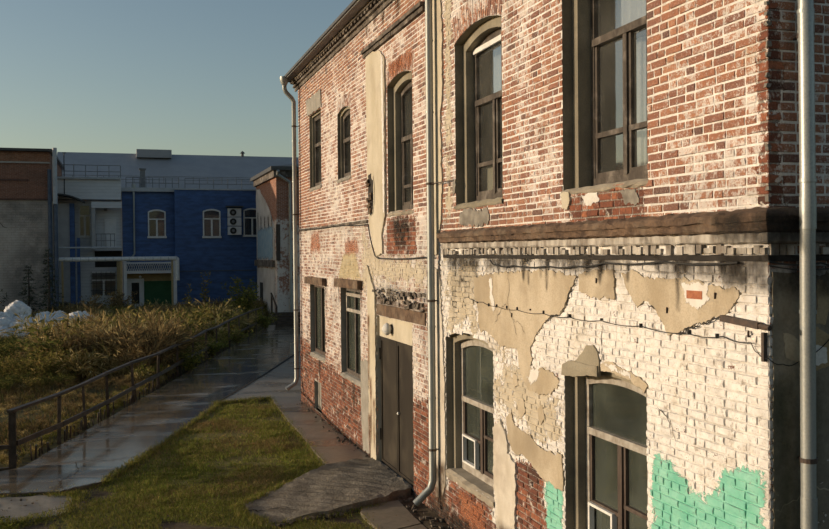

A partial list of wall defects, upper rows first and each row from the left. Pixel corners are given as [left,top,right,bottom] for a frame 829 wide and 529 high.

water stain [714,214,800,242]
flaking render [300,0,741,529]
water stain [539,259,612,280]
water stain [667,257,765,289]
water stain [784,261,800,289]
flaking render [816,270,829,371]
flaking render [783,333,800,364]
peeling [650,452,767,529]